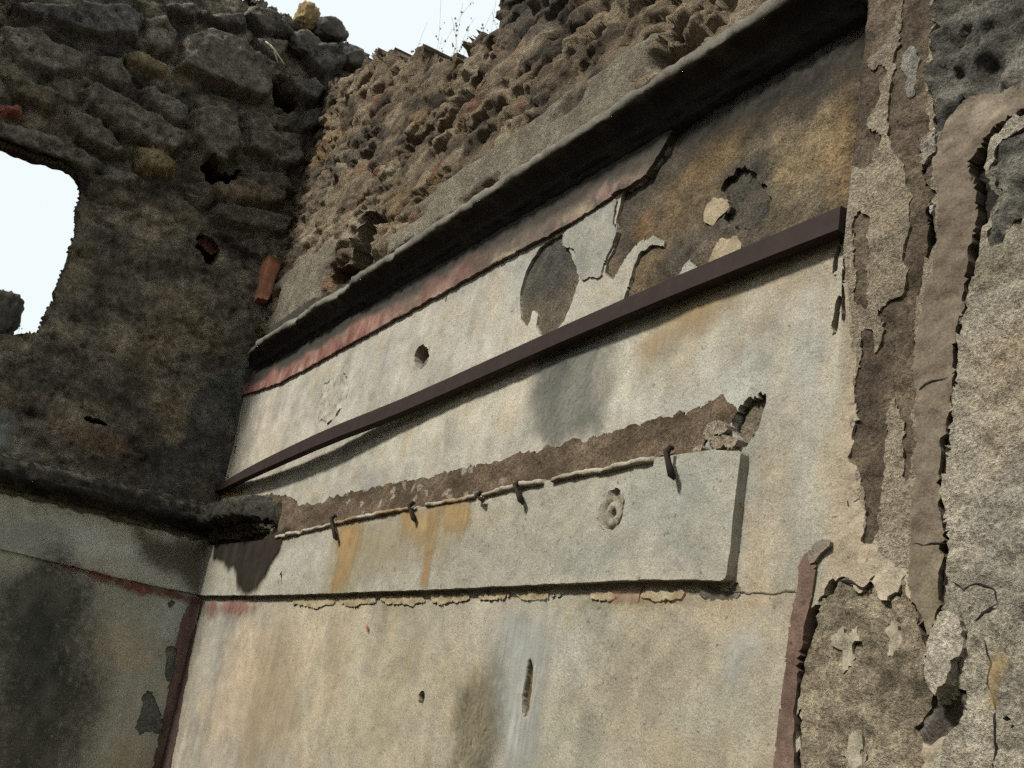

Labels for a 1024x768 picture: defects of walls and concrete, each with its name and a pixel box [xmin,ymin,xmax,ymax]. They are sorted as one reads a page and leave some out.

flaking render [522,0,1024,544]
crack [919,325,962,390]
corrosion [330,525,362,592]
peeling [293,591,563,609]
corrosion [402,503,469,586]
peeling [590,592,617,602]
peeling [640,588,686,602]
crack [913,416,999,768]
leakage [0,557,100,768]
flaking render [800,577,936,768]
flaking render [135,691,163,736]